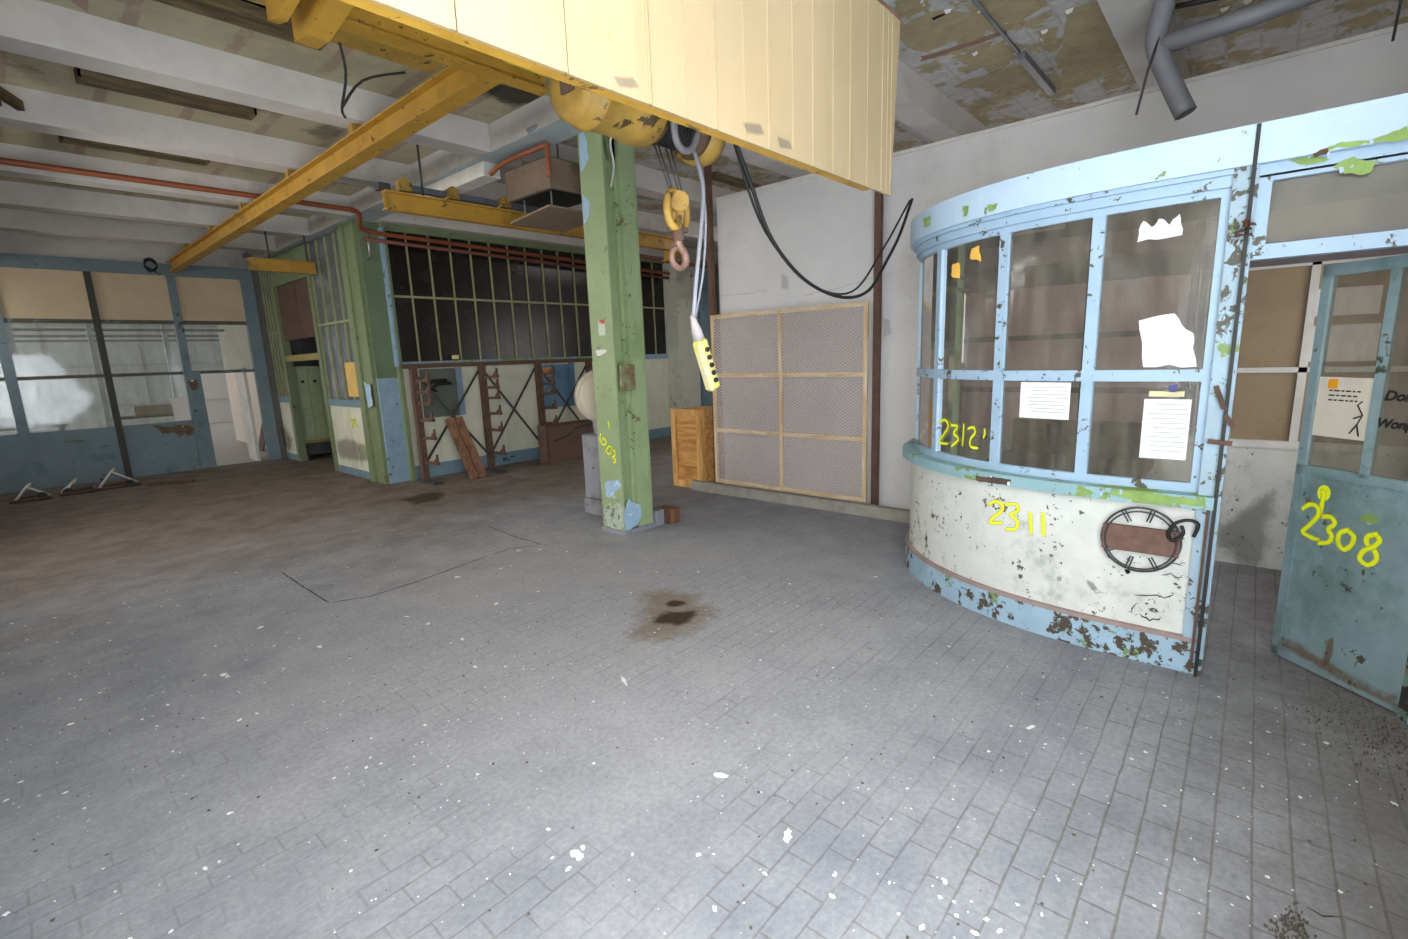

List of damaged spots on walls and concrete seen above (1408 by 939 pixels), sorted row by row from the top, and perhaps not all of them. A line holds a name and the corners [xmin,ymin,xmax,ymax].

peeling [894,0,1008,62]
peeling [1038,1,1126,96]
peeling [1214,0,1264,16]
peeling [954,64,1034,93]
peeling [1289,121,1408,175]